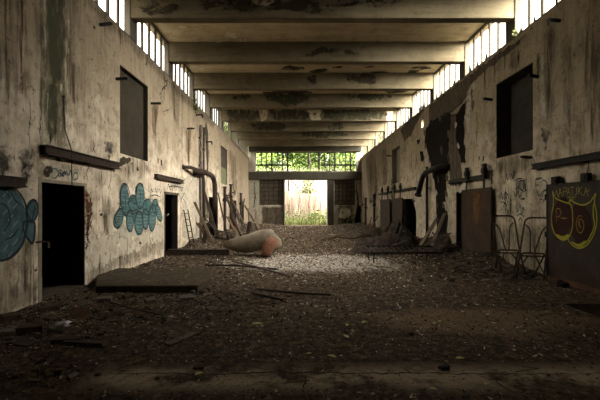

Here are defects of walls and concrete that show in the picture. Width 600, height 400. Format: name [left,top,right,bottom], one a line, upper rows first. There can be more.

damp [40,0,70,149]
peeling [226,65,393,138]
flaking render [416,83,475,234]